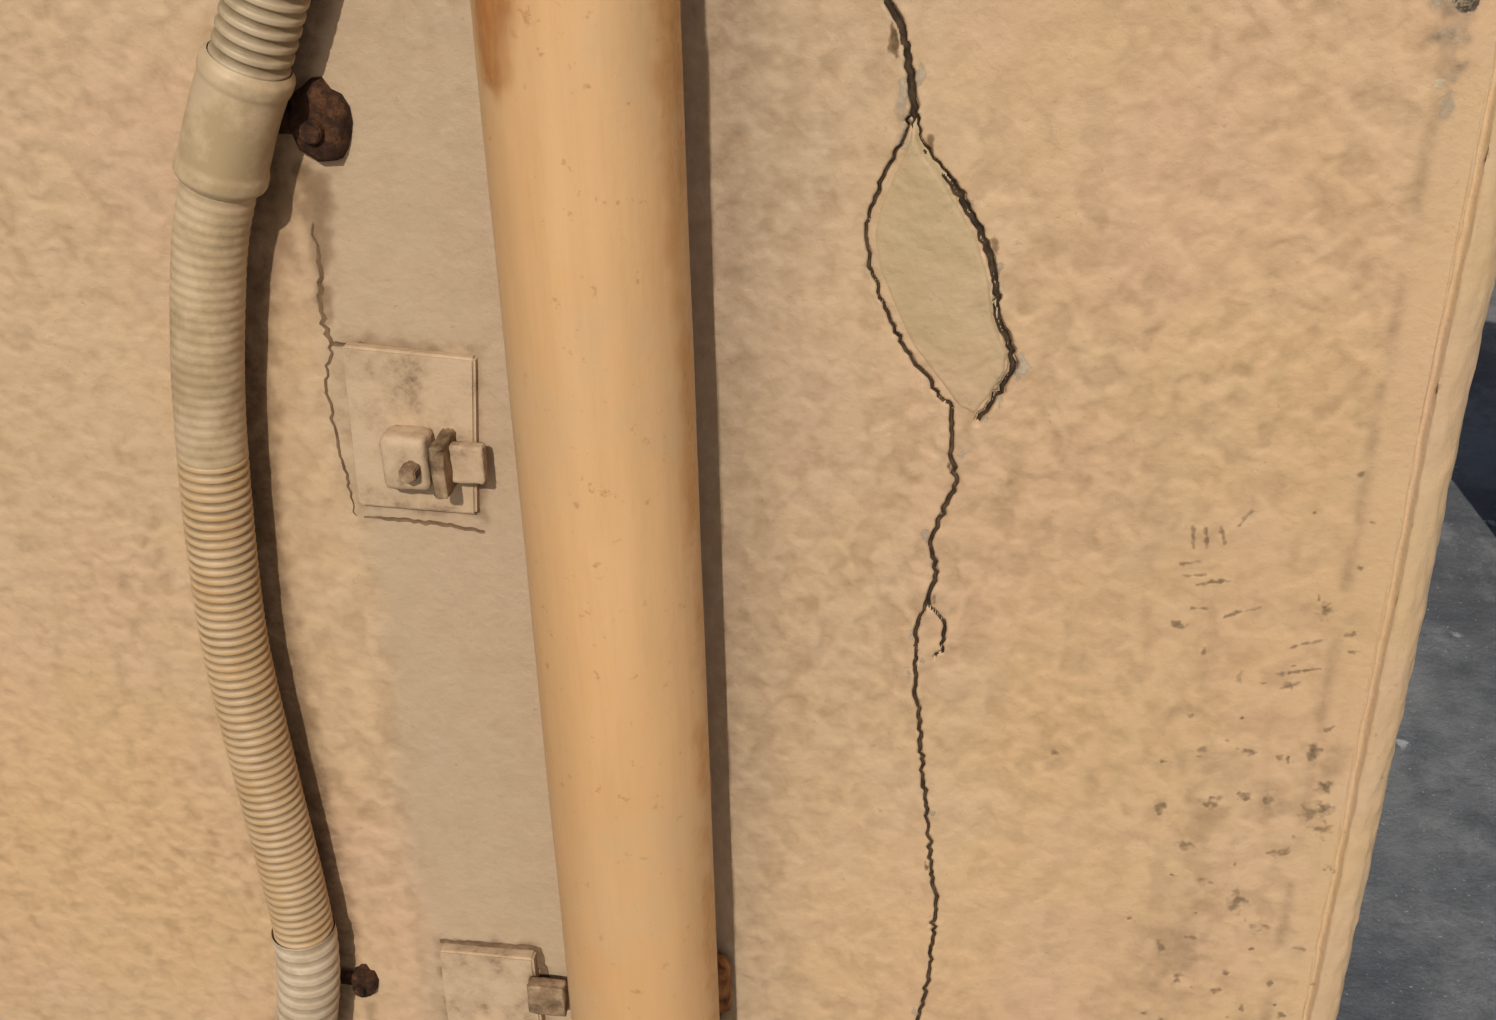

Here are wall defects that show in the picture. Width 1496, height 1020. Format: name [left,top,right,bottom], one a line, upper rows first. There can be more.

corrosion [474,0,507,86]
crack [864,0,1031,1020]